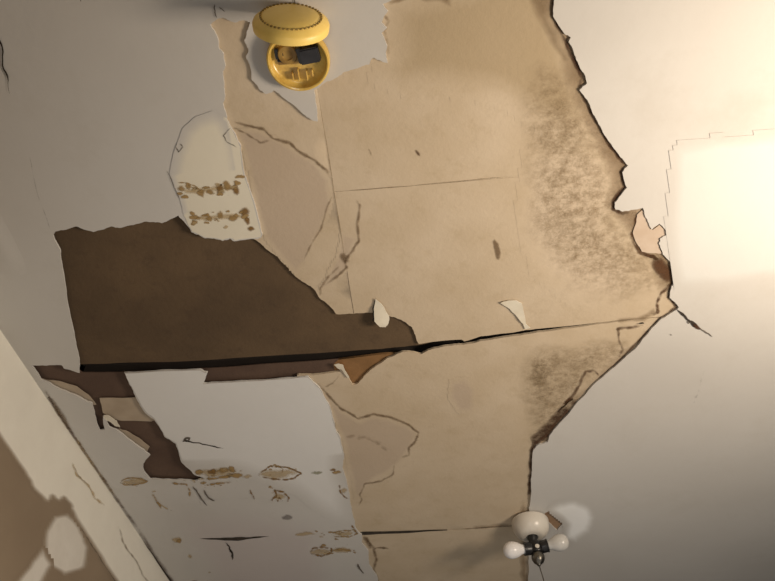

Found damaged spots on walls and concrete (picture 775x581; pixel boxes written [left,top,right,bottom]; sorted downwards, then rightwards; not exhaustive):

crack [0,41,10,94]
water stain [366,0,677,368]
crack [83,323,590,372]
flaking render [169,18,678,581]
crack [678,310,712,337]
water stain [528,371,591,495]